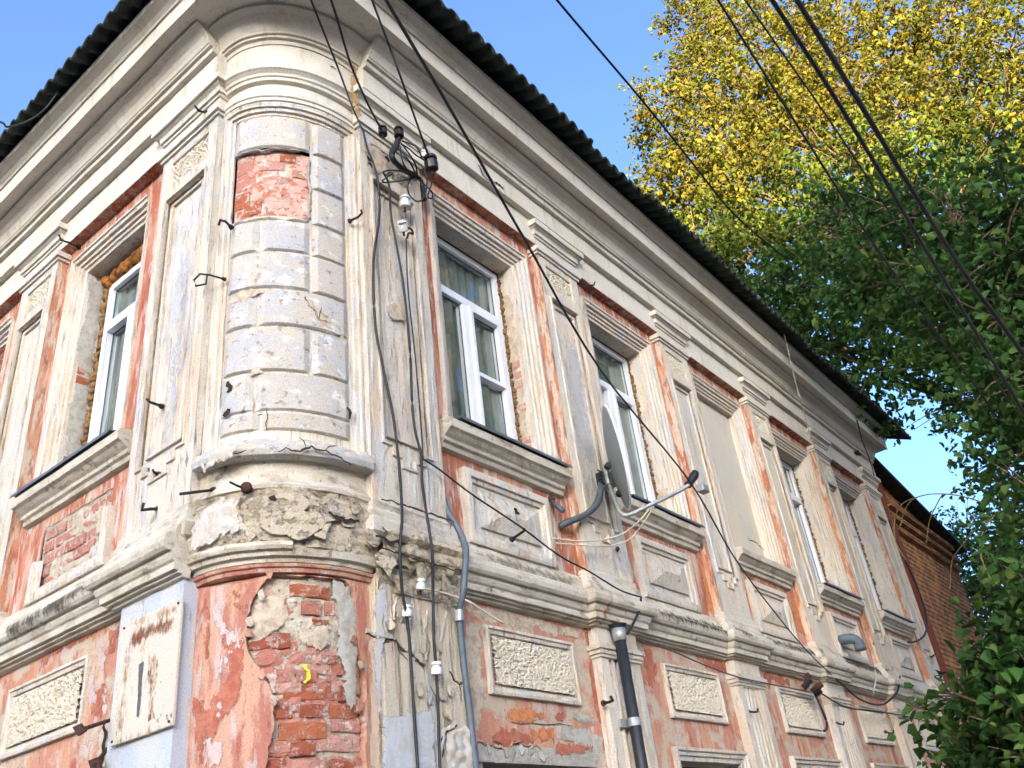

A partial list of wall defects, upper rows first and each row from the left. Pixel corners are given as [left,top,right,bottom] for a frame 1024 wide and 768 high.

flaking render [234,148,312,226]
crack [260,407,351,465]
flaking render [39,487,114,587]
flaking render [189,488,604,768]